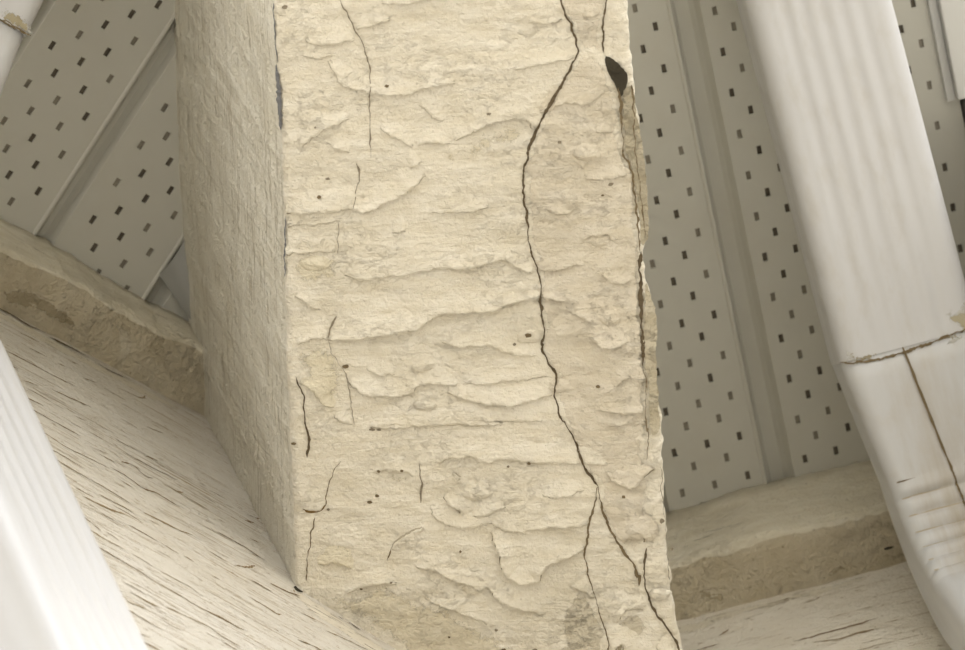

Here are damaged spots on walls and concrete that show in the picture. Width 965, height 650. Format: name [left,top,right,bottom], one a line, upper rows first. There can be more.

crack [337,0,371,253]
spalling [605,56,649,245]
crack [296,378,311,457]
crack [328,316,354,422]
crack [522,0,680,650]
crack [303,463,340,580]
spalling [563,597,604,650]
spalling [619,616,646,635]
crack [796,618,876,642]